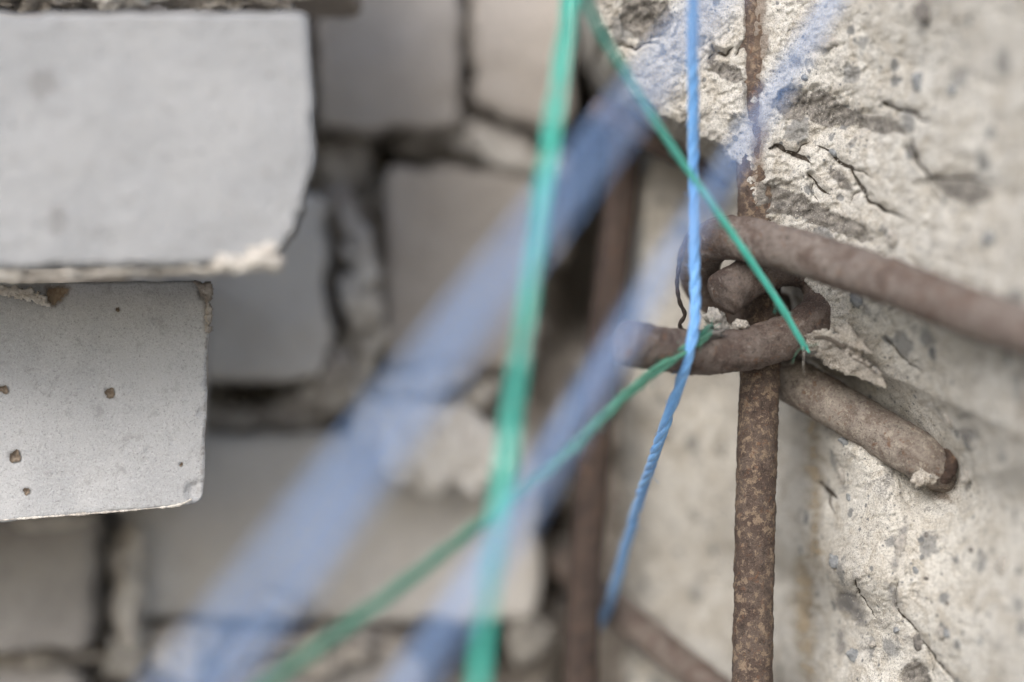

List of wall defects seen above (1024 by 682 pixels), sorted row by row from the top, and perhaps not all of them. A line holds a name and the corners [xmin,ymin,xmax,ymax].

crack [768,142,909,220]
spalling [550,0,1024,682]
crack [855,578,955,682]